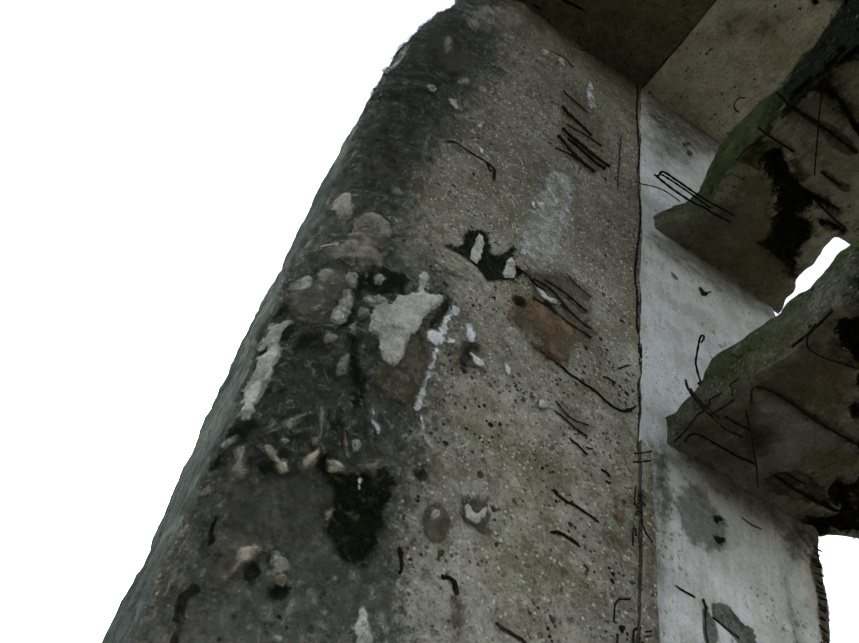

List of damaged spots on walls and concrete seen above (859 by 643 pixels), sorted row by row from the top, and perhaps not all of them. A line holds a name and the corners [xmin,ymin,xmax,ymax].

damp [647,0,859,299]
crack [832,90,859,137]
damp [125,0,518,643]
peeling [236,268,444,421]
spalling [445,229,594,339]
peeling [201,438,251,499]
peeling [264,411,362,474]
spalling [461,495,502,542]